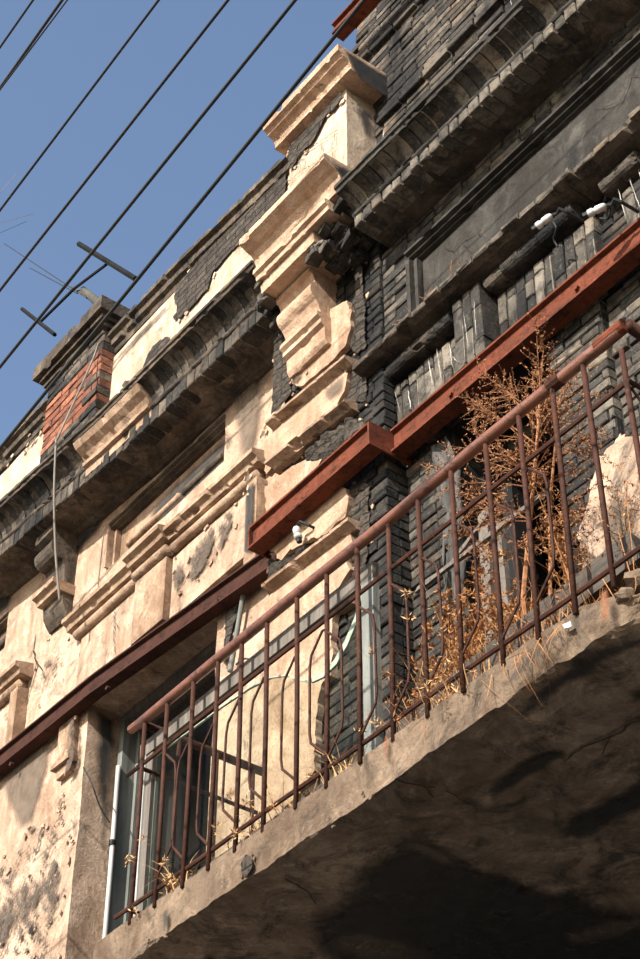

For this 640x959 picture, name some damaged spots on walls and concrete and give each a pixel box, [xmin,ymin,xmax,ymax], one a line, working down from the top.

flaking render [173,91,346,323]
flaking render [143,336,170,367]
flaking render [254,281,308,414]
spalling [305,197,376,406]
flaking render [301,416,365,461]
flaking render [266,542,314,579]
flaking render [348,481,374,578]